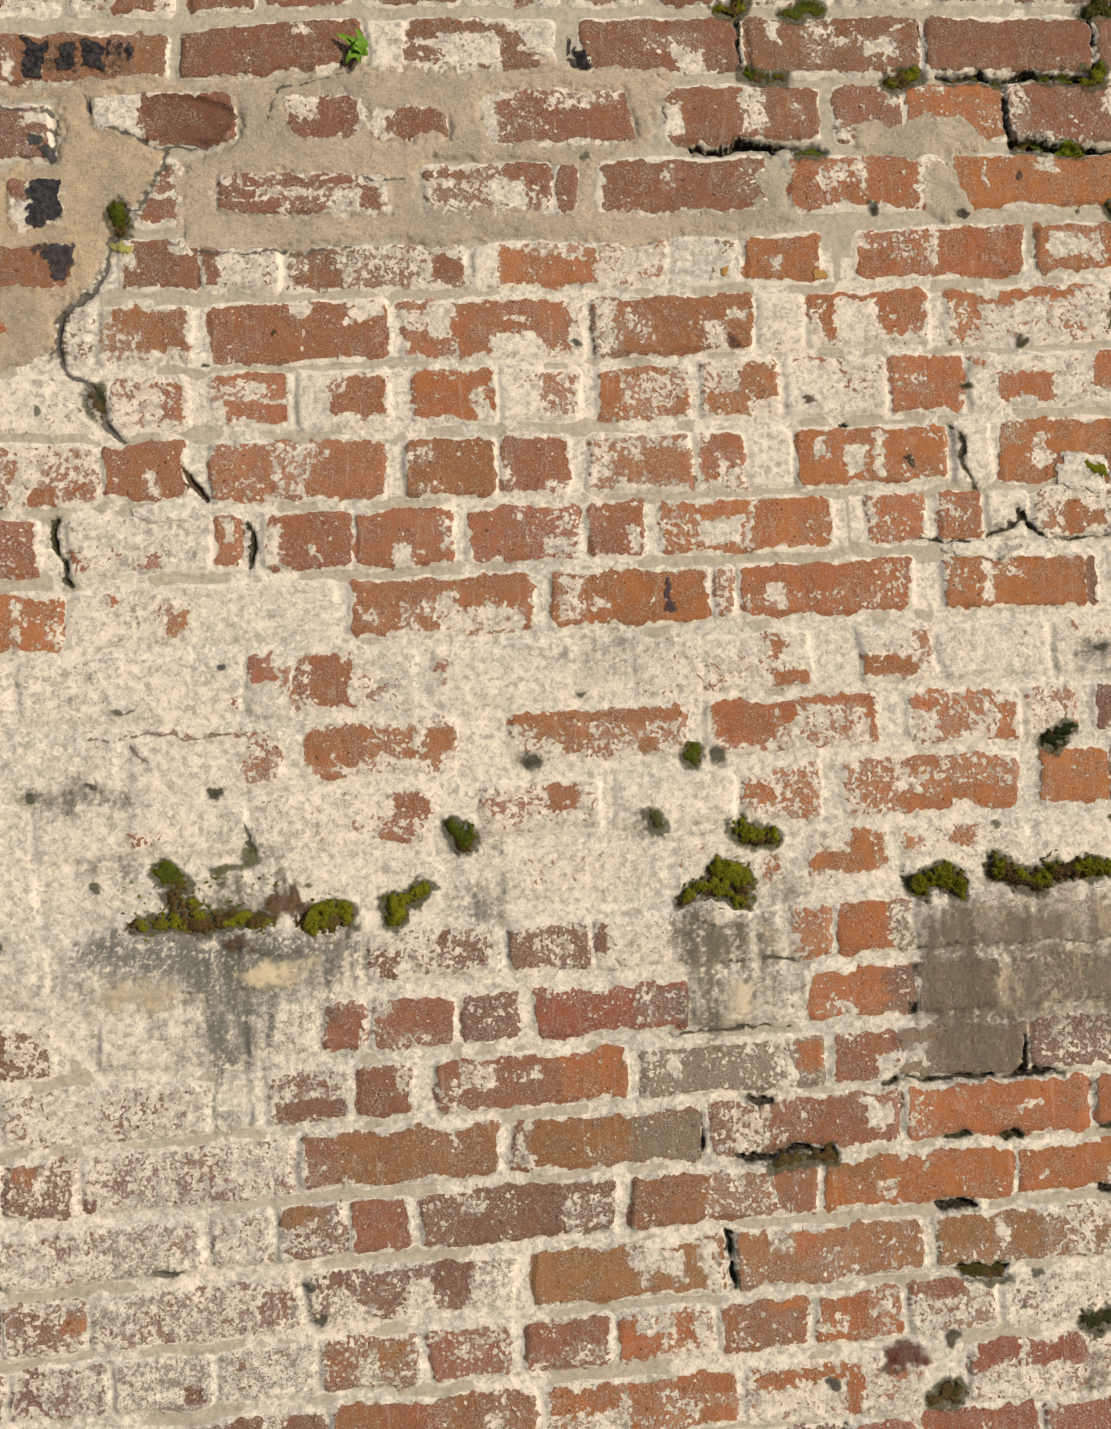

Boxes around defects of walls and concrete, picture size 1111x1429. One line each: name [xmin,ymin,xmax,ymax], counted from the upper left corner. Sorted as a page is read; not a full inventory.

crack [1001,88,1011,140]
crack [0,95,209,444]
crack [182,465,210,503]
crack [948,424,977,490]
crack [921,507,1110,544]
water stain [522,752,543,769]
water stain [21,777,133,818]
water stain [207,788,224,799]
water stain [73,925,366,1074]
water stain [670,909,778,1030]
water stain [911,888,1111,1082]
crack [724,1228,739,1289]